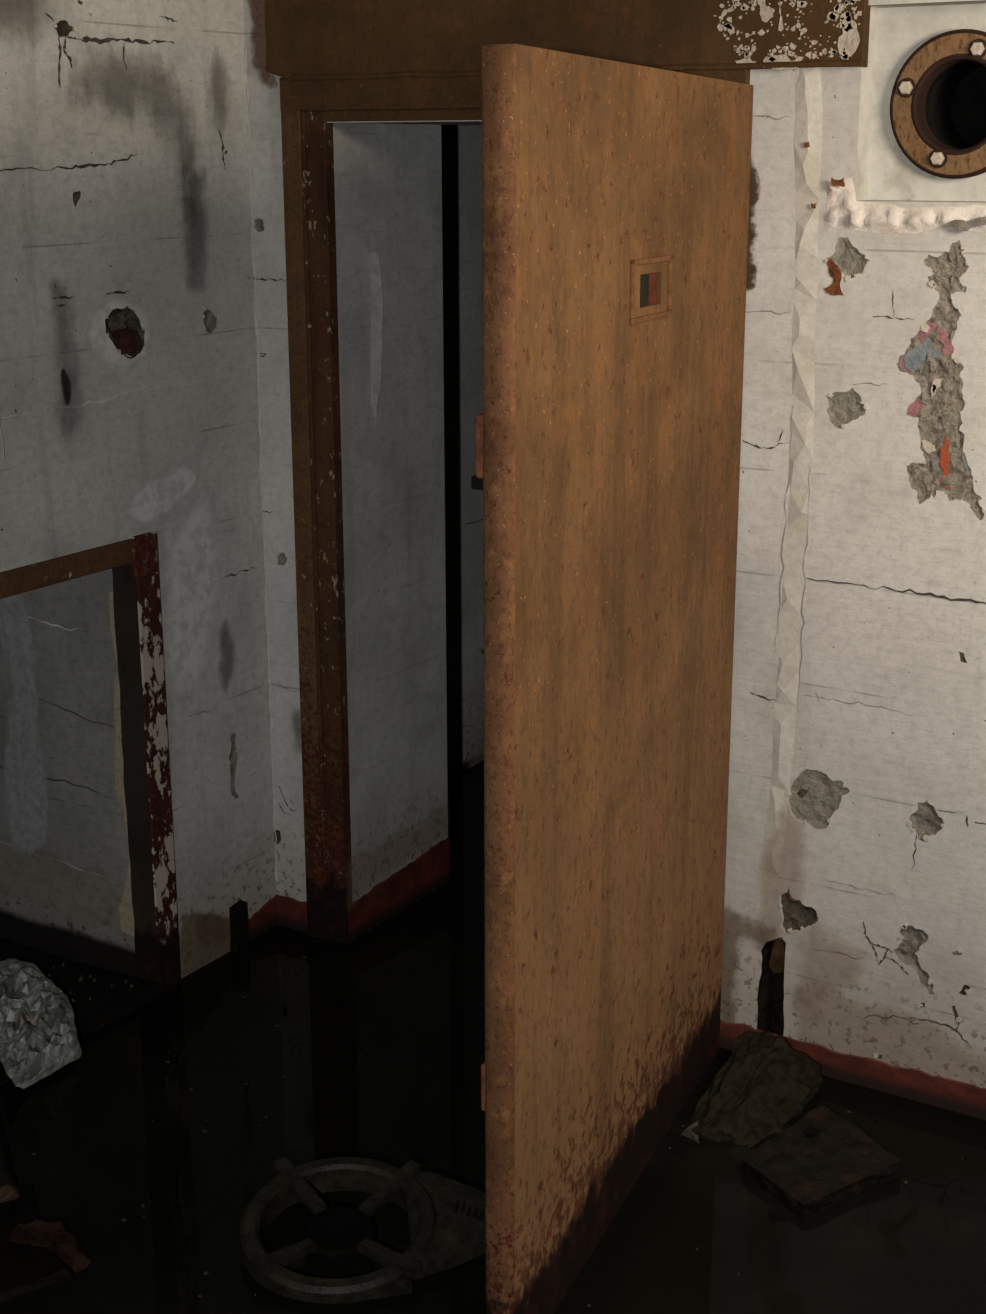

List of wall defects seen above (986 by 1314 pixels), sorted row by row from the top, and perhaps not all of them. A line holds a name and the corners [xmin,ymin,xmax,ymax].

peeling [713,0,862,70]
spalling [824,237,870,296]
spalling [827,387,867,428]
peeling [896,240,986,520]
spalling [786,769,850,829]
spalling [907,800,969,872]
spalling [779,887,818,933]
spalling [863,921,935,1008]